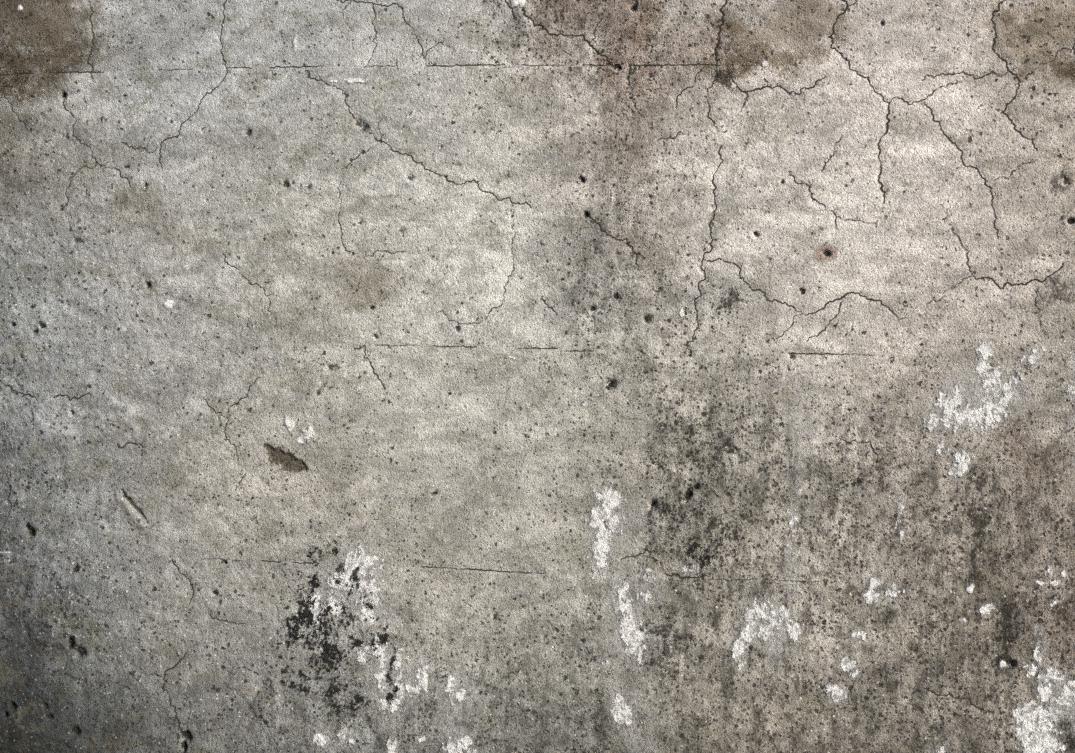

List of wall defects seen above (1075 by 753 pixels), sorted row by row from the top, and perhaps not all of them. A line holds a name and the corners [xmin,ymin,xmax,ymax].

crack [63,0,229,207]
crack [338,0,450,66]
crack [505,0,644,116]
crack [305,70,531,287]
crack [657,0,1075,356]
crack [436,232,516,325]
spalling [261,413,317,472]
leakage [645,490,747,581]
leakage [966,466,992,581]
leakage [278,541,400,723]
leakage [635,605,693,679]
leakage [993,601,1019,669]